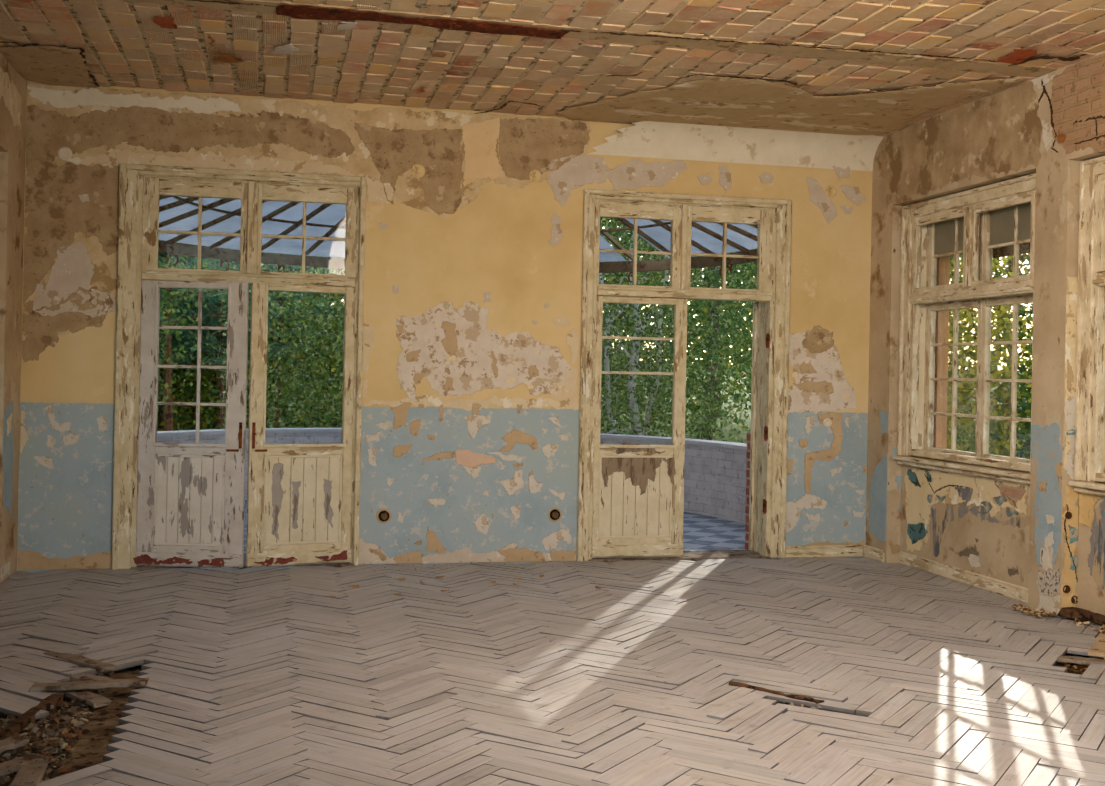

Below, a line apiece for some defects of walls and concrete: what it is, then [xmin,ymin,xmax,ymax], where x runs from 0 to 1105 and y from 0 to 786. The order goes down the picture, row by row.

crack [188,0,278,8]
crack [0,40,39,48]
crack [67,48,99,87]
crack [568,30,1105,153]
peeling [22,83,732,362]
peeling [363,291,579,519]
peeling [786,325,857,533]
peeling [806,277,1105,608]
peeling [271,463,301,540]
peeling [323,479,334,528]
peeling [254,557,297,566]
peeling [315,527,576,564]